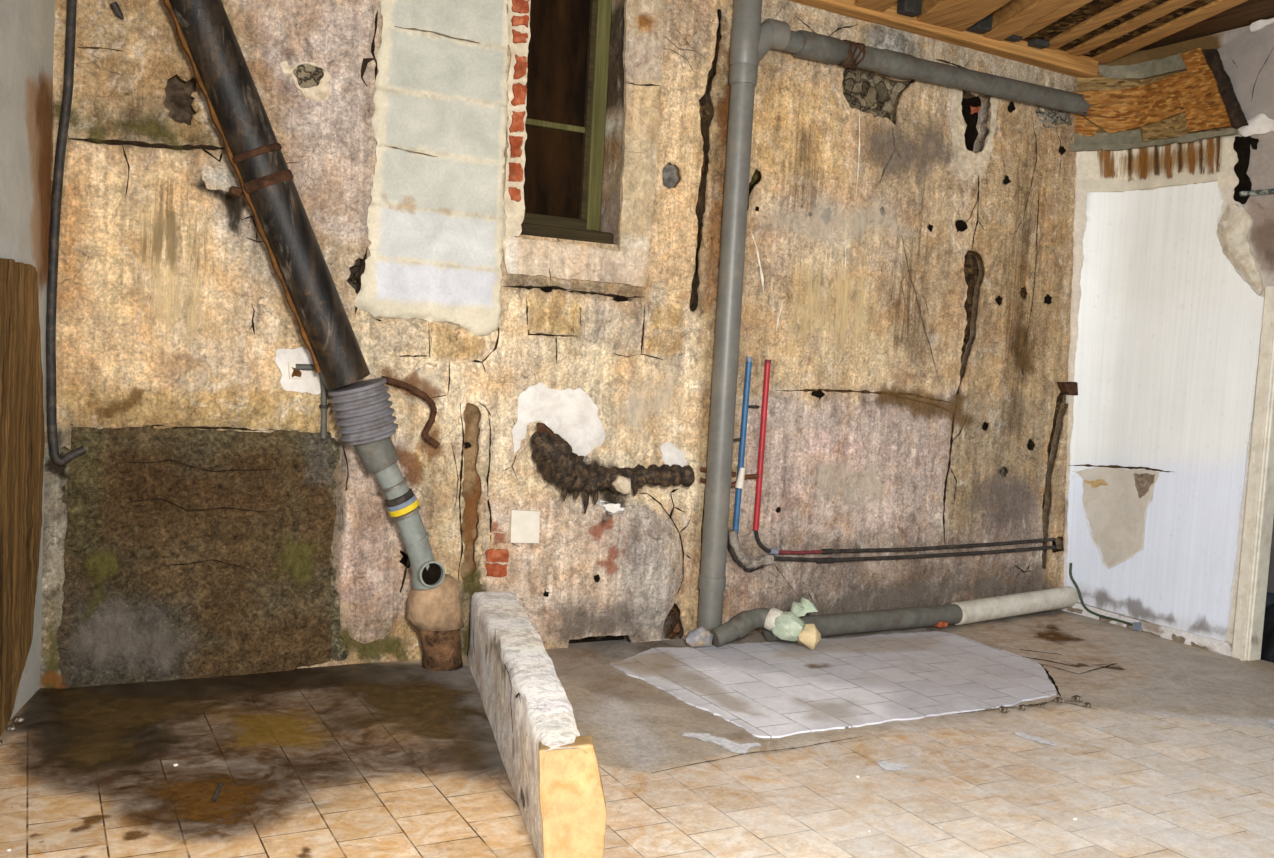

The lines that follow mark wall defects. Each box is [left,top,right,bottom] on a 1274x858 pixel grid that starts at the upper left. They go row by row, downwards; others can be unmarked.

spalling [163,77,219,134]
spalling [842,68,910,121]
crack [69,138,225,193]
spalling [1233,136,1259,204]
corrosion [385,370,438,398]
crack [776,217,965,545]
peeling [1071,464,1171,569]
water stain [45,625,224,770]
water stain [344,680,479,763]
water stain [71,815,108,832]
water stain [125,831,148,840]
water stain [155,777,263,836]